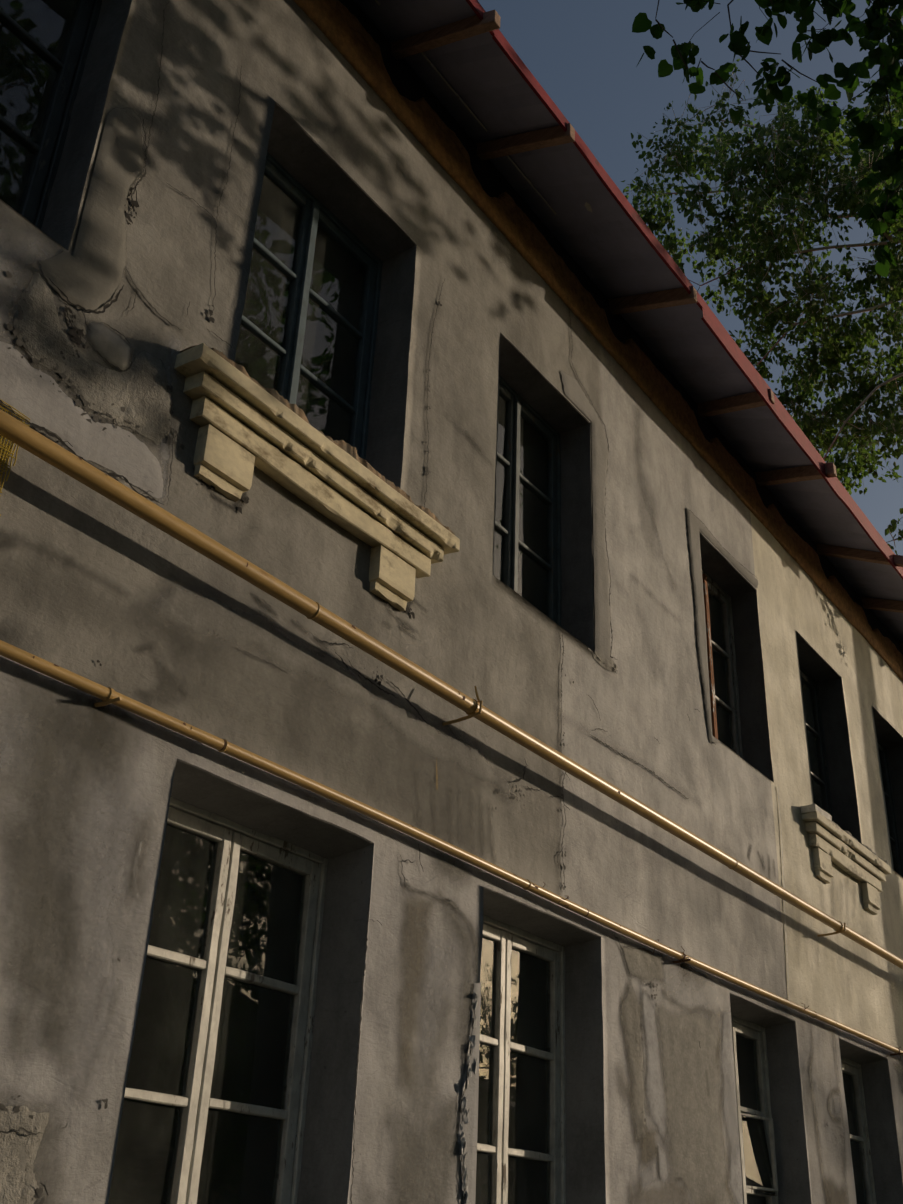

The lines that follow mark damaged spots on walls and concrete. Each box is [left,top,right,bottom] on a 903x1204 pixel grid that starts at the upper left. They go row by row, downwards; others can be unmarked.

crack [124,0,242,342]
flaking render [6,271,184,450]
crack [316,630,570,892]
flaking render [0,1095,67,1204]
water stain [396,1106,456,1204]
water stain [402,883,478,1078]
peeling [458,982,481,1204]
water stain [639,979,743,1204]